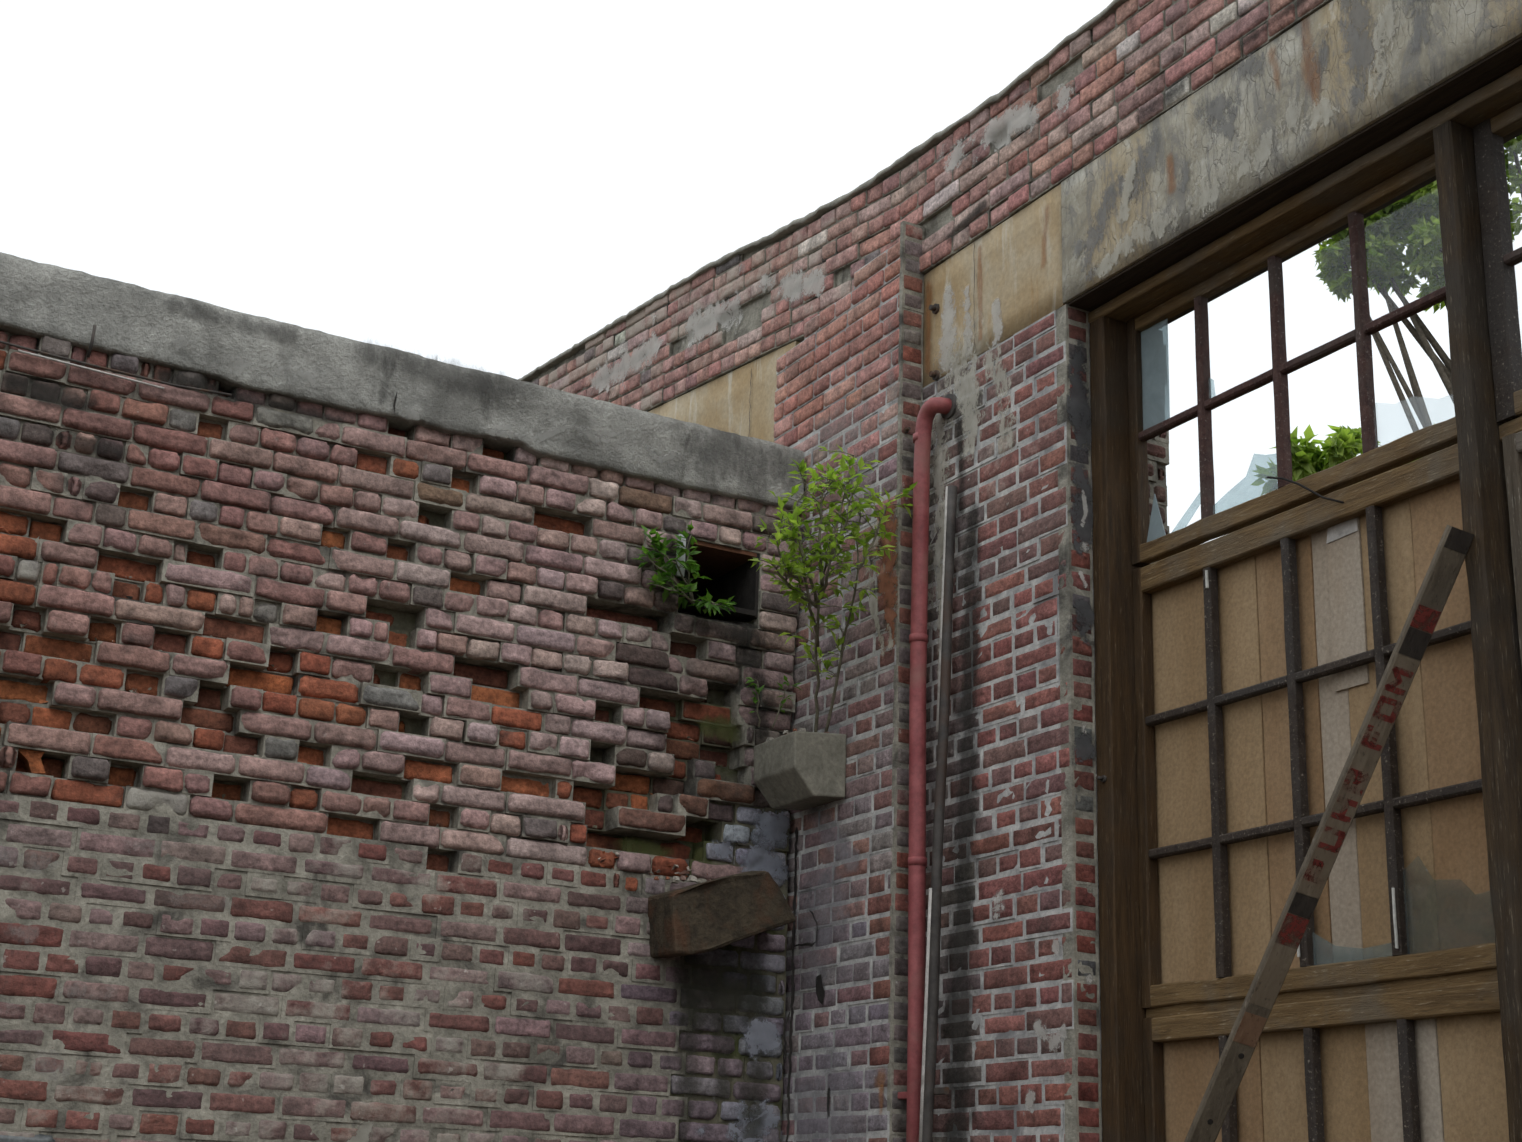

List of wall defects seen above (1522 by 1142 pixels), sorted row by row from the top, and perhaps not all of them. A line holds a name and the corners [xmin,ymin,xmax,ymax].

spalling [534,512,585,536]
spalling [97,553,159,601]
spalling [0,607,120,663]
spalling [365,605,416,647]
spalling [586,606,699,659]
spalling [153,615,295,756]
spalling [453,661,521,708]
spalling [0,677,114,778]
spalling [398,717,423,735]
spalling [351,758,454,800]
spalling [573,689,792,886]
spalling [327,815,376,840]